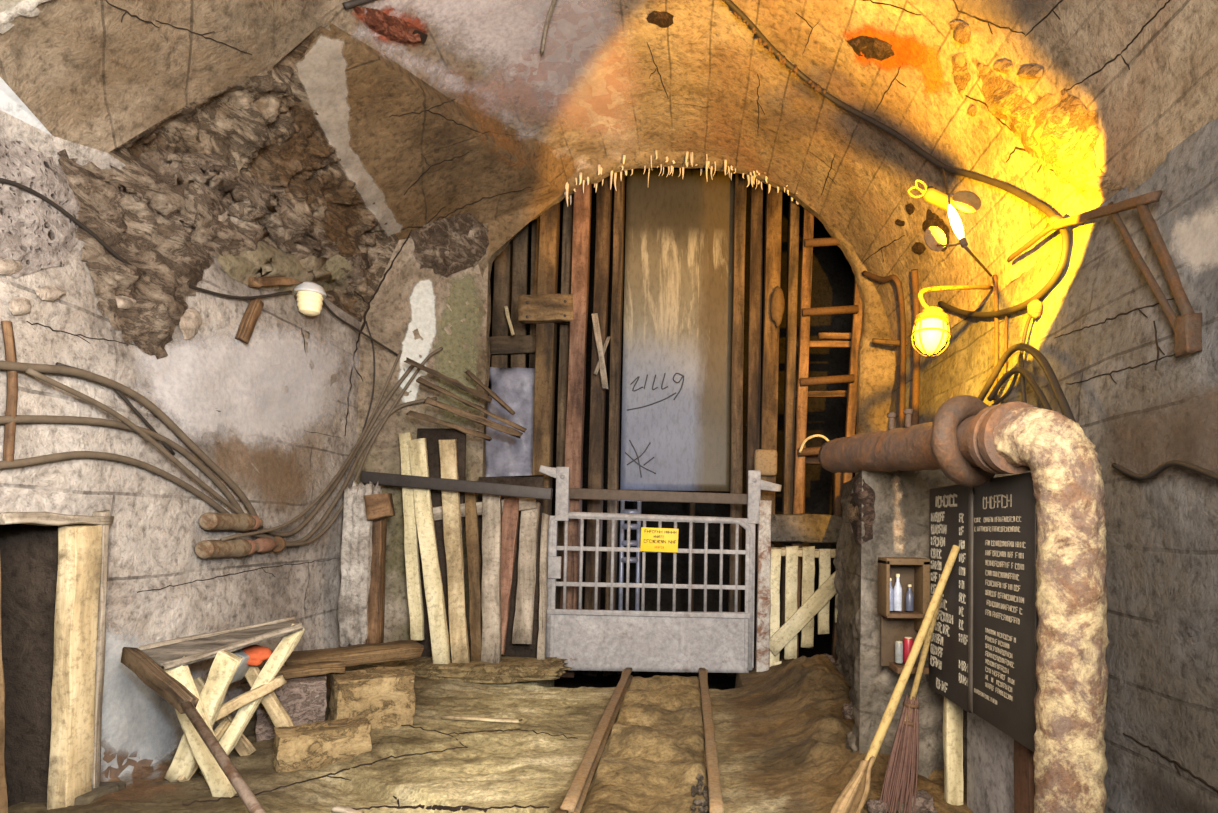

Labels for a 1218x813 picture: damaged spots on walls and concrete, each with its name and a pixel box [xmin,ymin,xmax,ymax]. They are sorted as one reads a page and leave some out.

crack [105,0,252,55]
corrosion [382,8,424,44]
spalling [847,35,895,61]
spalling [0,140,381,359]